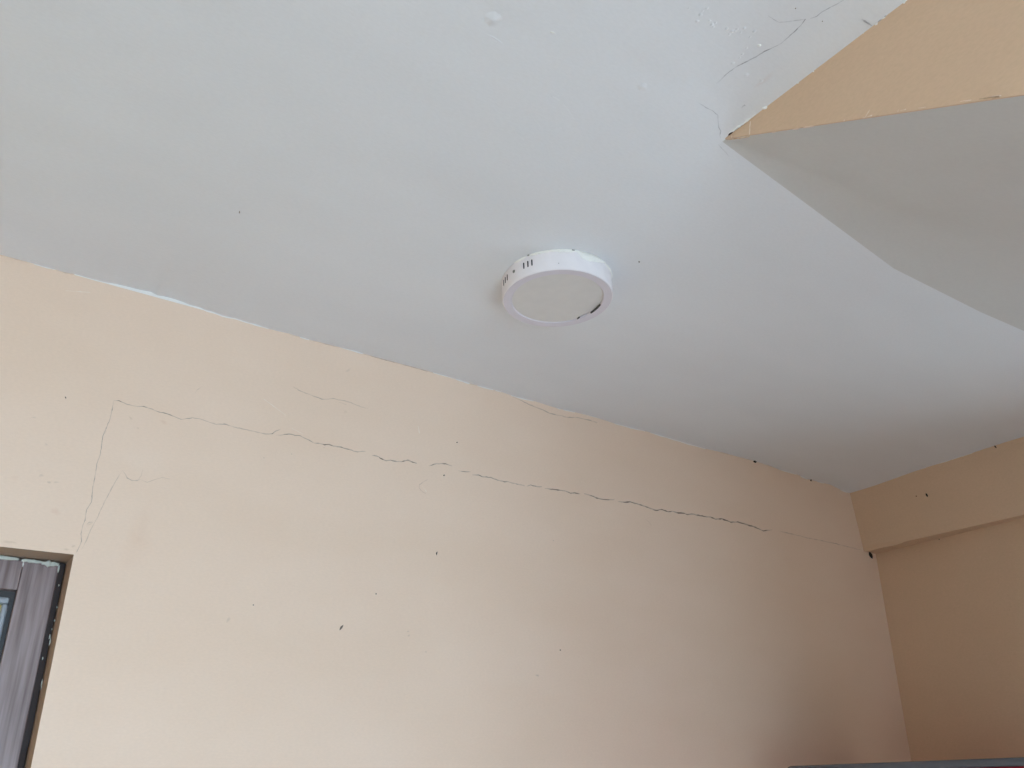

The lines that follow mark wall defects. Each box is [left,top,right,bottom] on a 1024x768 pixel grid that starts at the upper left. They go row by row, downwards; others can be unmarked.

crack [716,0,843,84]
crack [76,386,862,552]